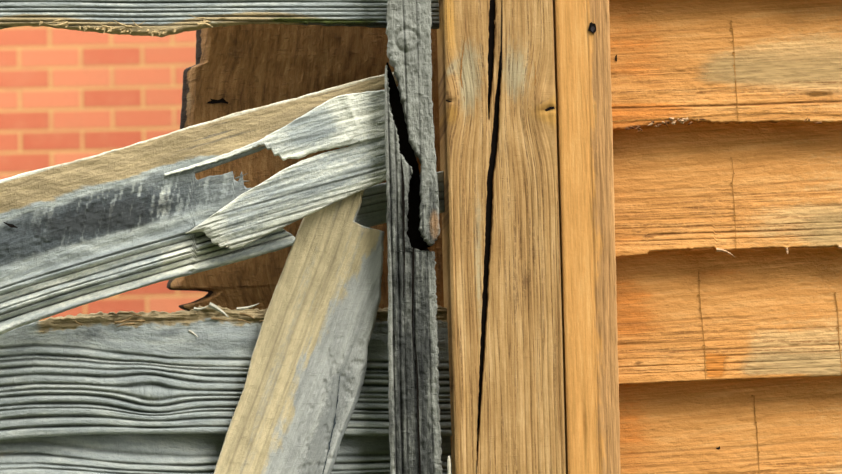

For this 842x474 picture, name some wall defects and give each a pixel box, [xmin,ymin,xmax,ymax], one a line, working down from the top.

crack [446,39,465,102]
crack [612,20,842,122]
crack [476,0,503,474]
crack [729,157,737,240]
peeling [193,302,229,318]
crack [697,271,706,380]
crack [834,292,842,374]
crack [751,395,760,474]